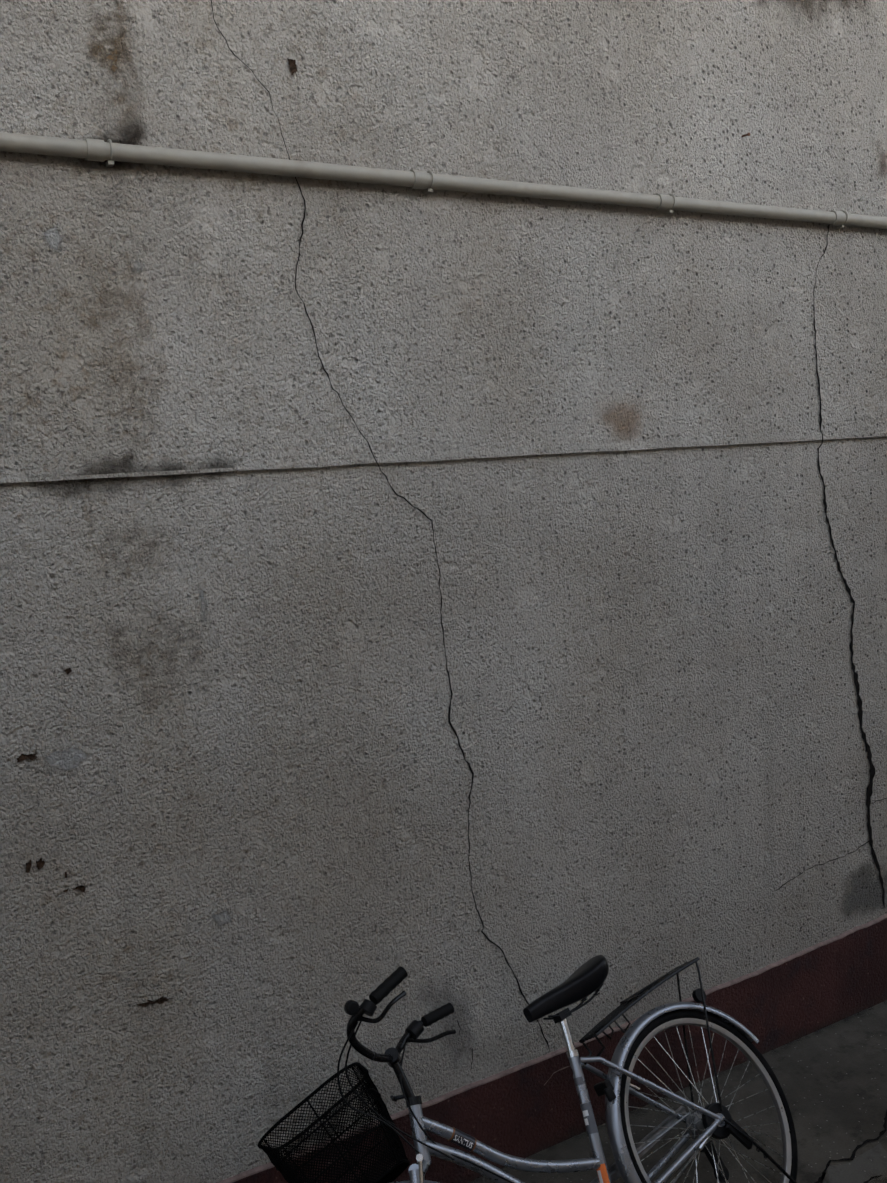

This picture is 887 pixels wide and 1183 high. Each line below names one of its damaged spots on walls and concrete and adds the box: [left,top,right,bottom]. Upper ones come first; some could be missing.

corrosion [91,5,128,80]
spalling [26,858,45,873]
crack [211,0,550,1051]
crack [775,225,887,908]